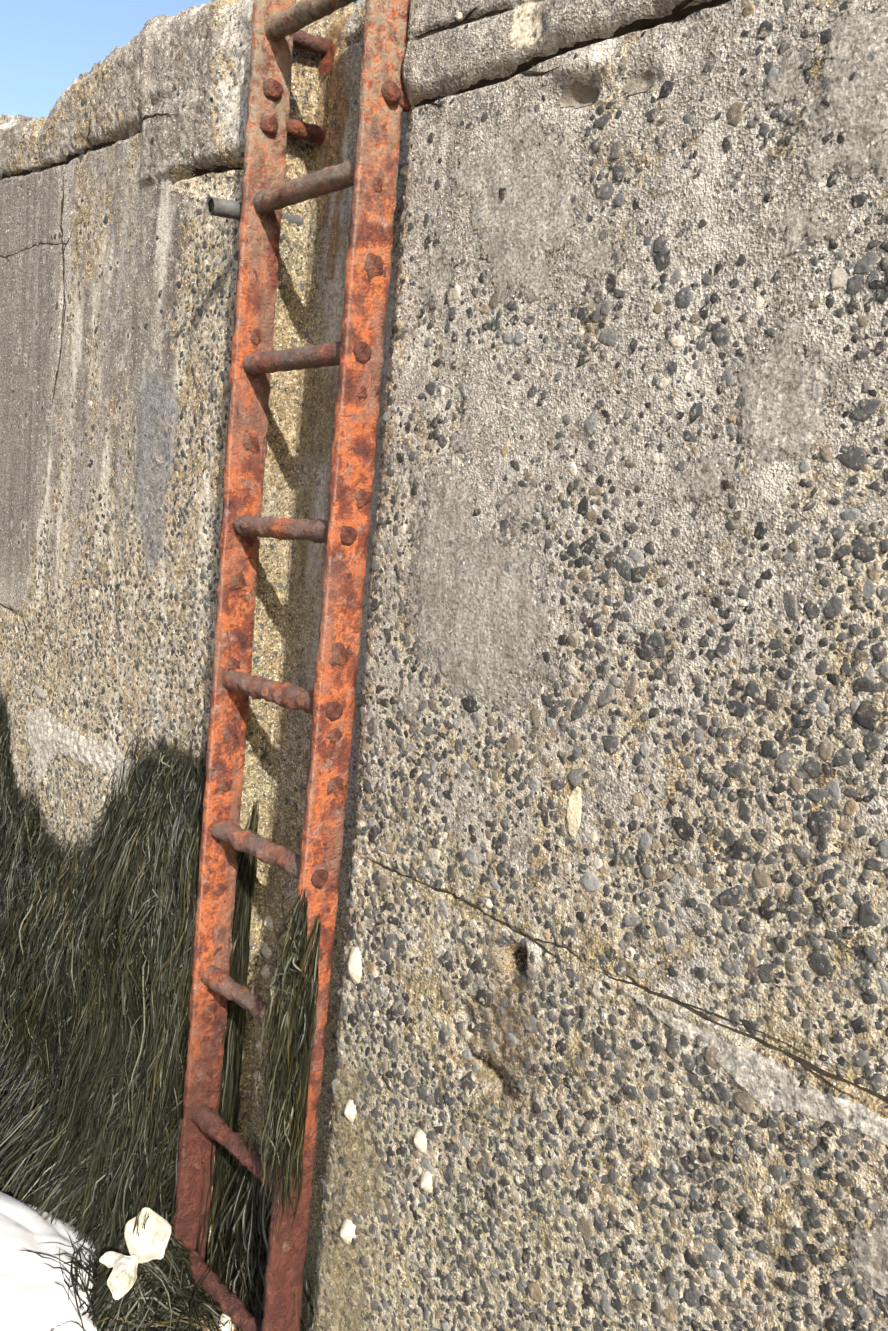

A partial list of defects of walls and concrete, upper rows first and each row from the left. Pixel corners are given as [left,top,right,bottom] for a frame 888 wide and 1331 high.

rust [316,17,348,168]
crack [410,0,731,107]
crack [1,113,176,407]
rust [318,189,343,280]
crack [363,857,888,1104]